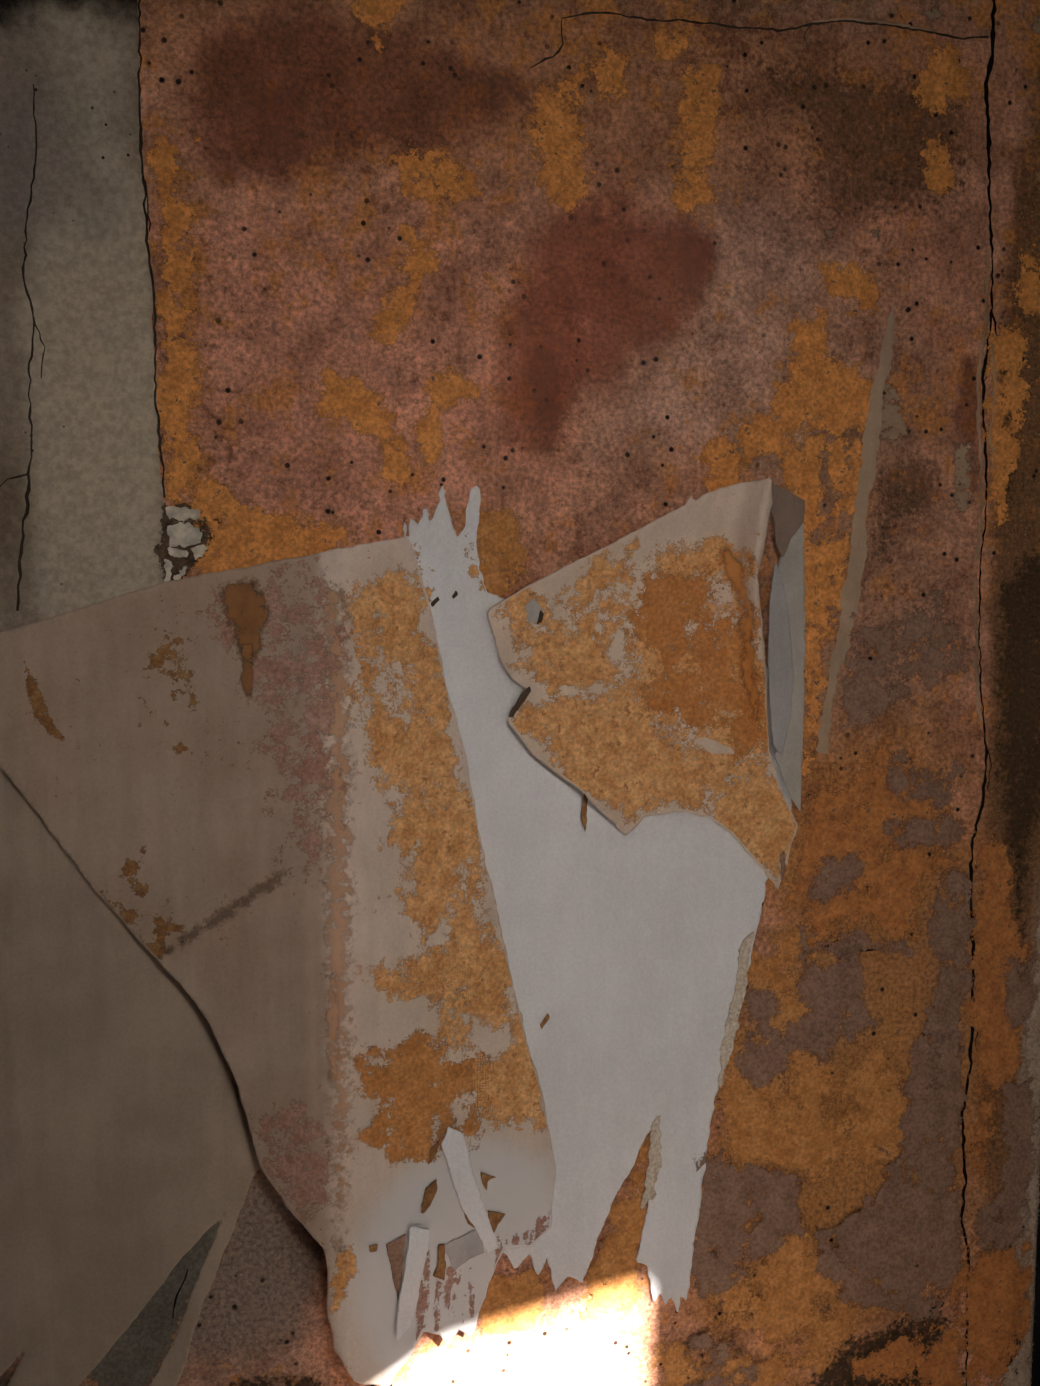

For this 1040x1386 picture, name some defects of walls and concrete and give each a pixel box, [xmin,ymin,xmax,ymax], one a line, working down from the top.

crack [0,84,45,611]
damp [505,203,709,439]
spalling [154,499,215,582]
rust [220,580,269,697]
crack [530,0,997,1386]
peeling [87,1221,219,1386]
peeling [416,1252,431,1340]
rust [421,1140,440,1213]
rust [433,1244,446,1280]
rust [461,1207,505,1232]
peeling [691,850,969,1323]
peeling [988,910,1040,1386]